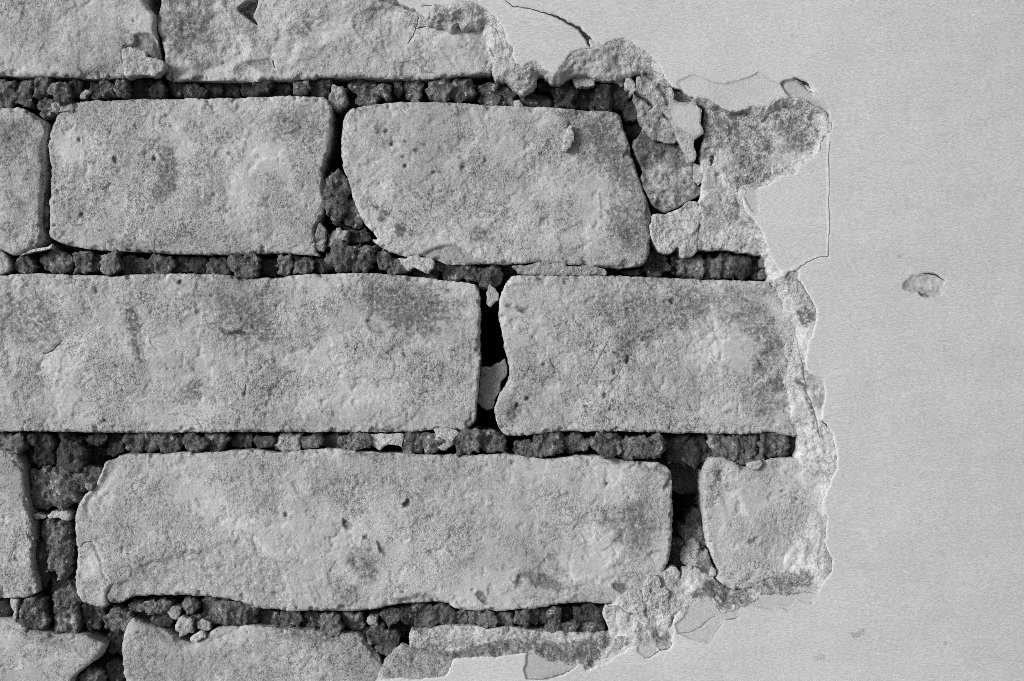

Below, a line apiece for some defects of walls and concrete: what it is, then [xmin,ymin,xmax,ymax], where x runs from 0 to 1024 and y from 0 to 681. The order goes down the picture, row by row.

spalling [222,2,274,72]
crack [506,1,592,46]
peeling [676,70,829,117]
flaking render [562,125,574,153]
crack [797,144,830,312]
flaking render [486,284,499,307]
flaking render [901,273,943,297]
spalling [110,541,290,609]
spalling [513,572,566,593]
peeling [638,592,815,658]
flaking render [382,646,457,679]
peeling [524,653,577,680]